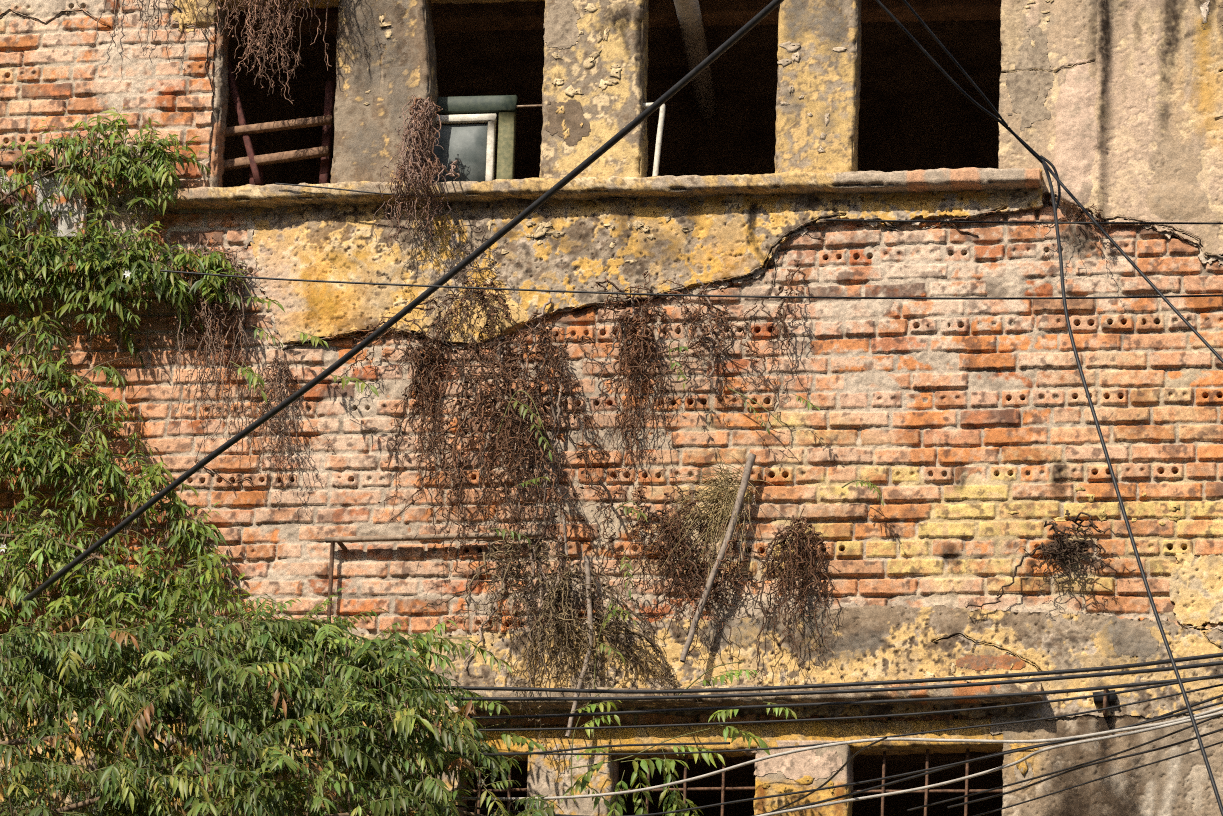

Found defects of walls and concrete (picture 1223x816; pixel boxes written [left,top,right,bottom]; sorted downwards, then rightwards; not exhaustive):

spalling [172,0,200,33]
peeling [379,15,398,62]
peeling [543,0,610,69]
peeling [599,64,622,91]
peeling [777,41,801,67]
damp [1093,0,1110,146]
damp [1161,0,1215,82]
spalling [546,78,591,146]
peeling [525,221,565,245]
peeling [603,221,655,249]
spalling [1112,627,1158,657]
damp [1044,703,1179,816]